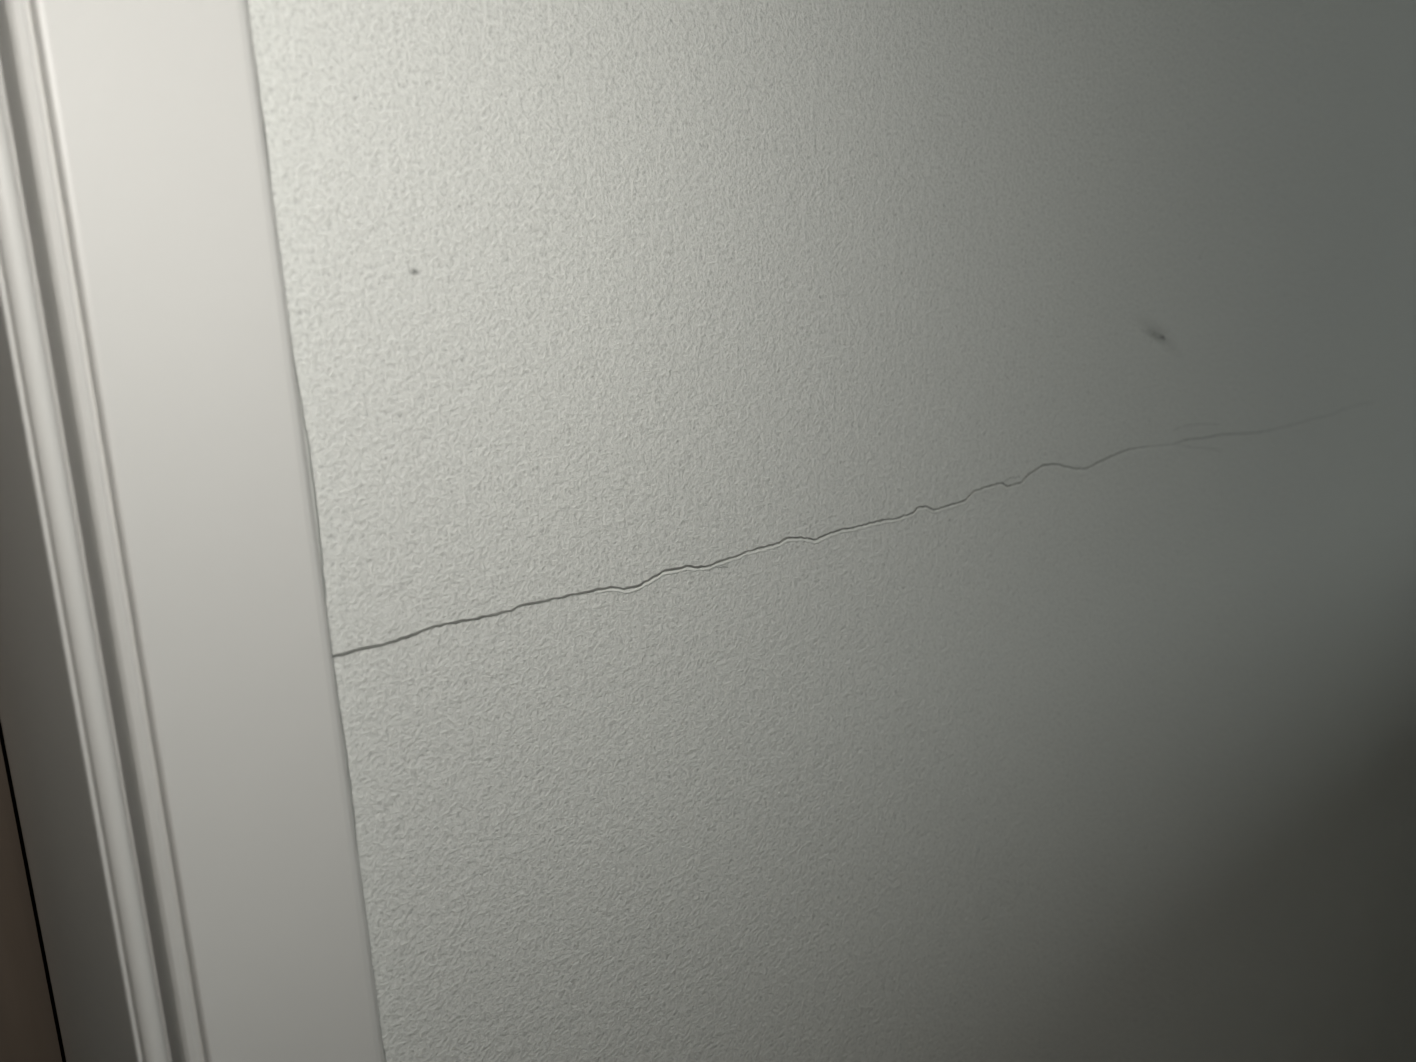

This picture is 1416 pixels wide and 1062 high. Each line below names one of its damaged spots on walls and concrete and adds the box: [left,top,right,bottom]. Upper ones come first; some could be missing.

crack [332,402,1369,658]